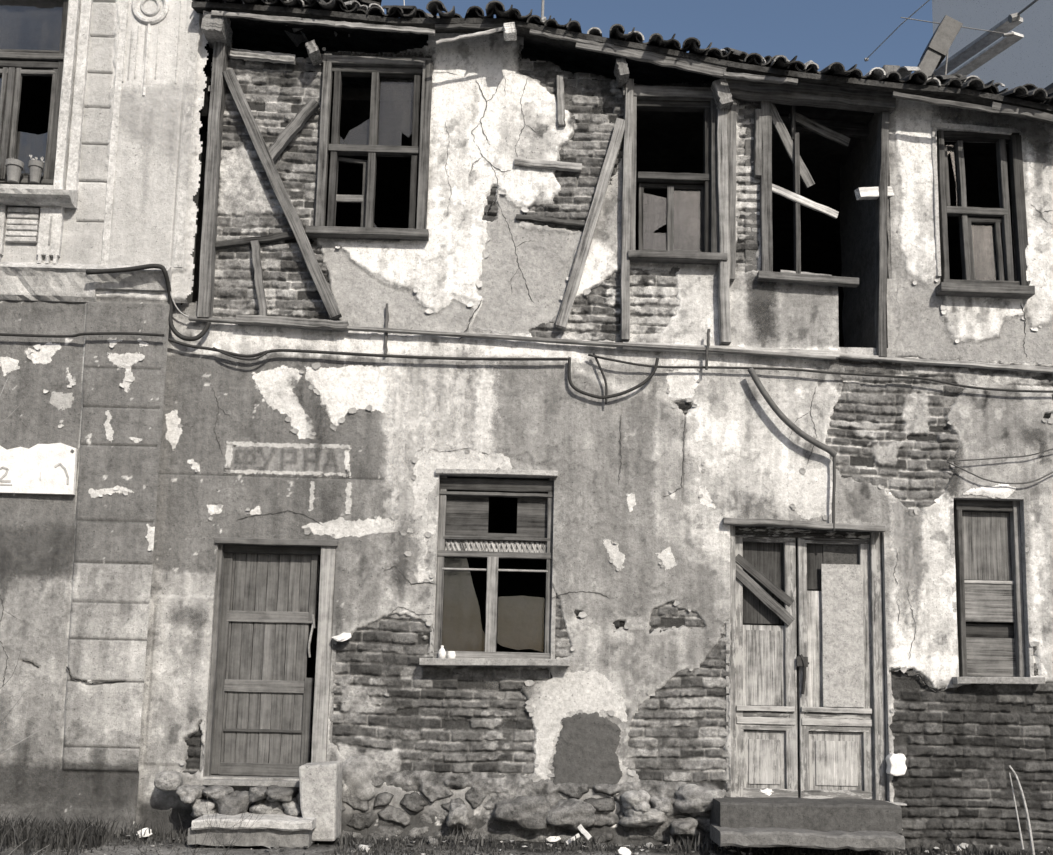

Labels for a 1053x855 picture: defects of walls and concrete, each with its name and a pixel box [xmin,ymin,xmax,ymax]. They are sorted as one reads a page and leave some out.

flaking render [212,44,680,343]